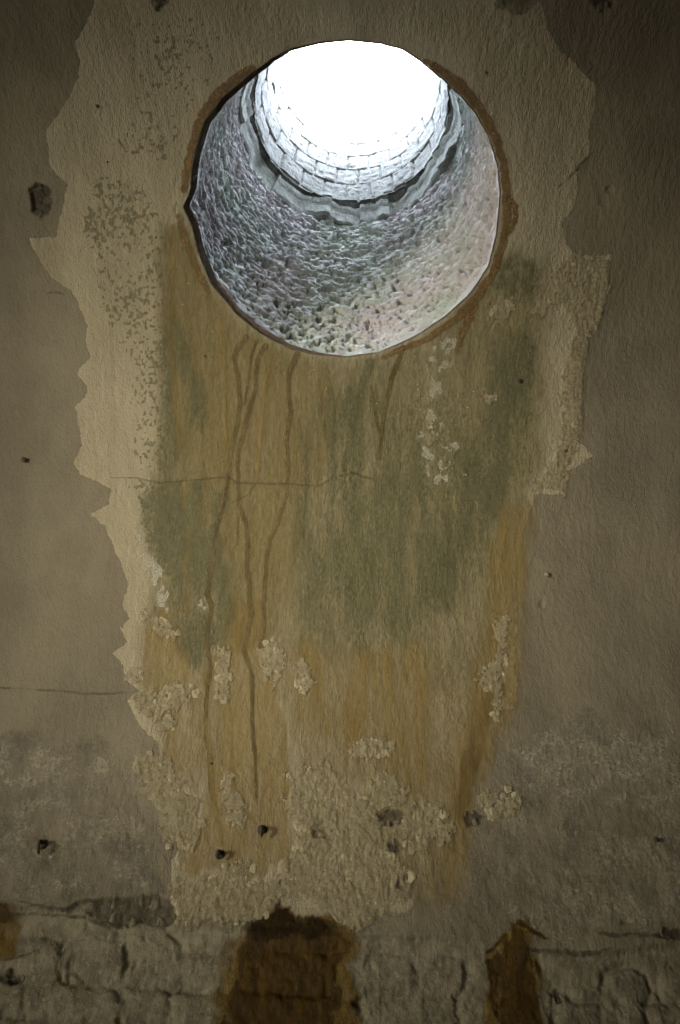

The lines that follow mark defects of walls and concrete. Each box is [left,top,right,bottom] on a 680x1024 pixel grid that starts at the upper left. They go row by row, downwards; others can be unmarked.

rust [180,65,255,193]
rust [381,59,518,359]
peeling [29,0,612,932]
water stain [108,225,545,897]
peeling [0,740,124,792]